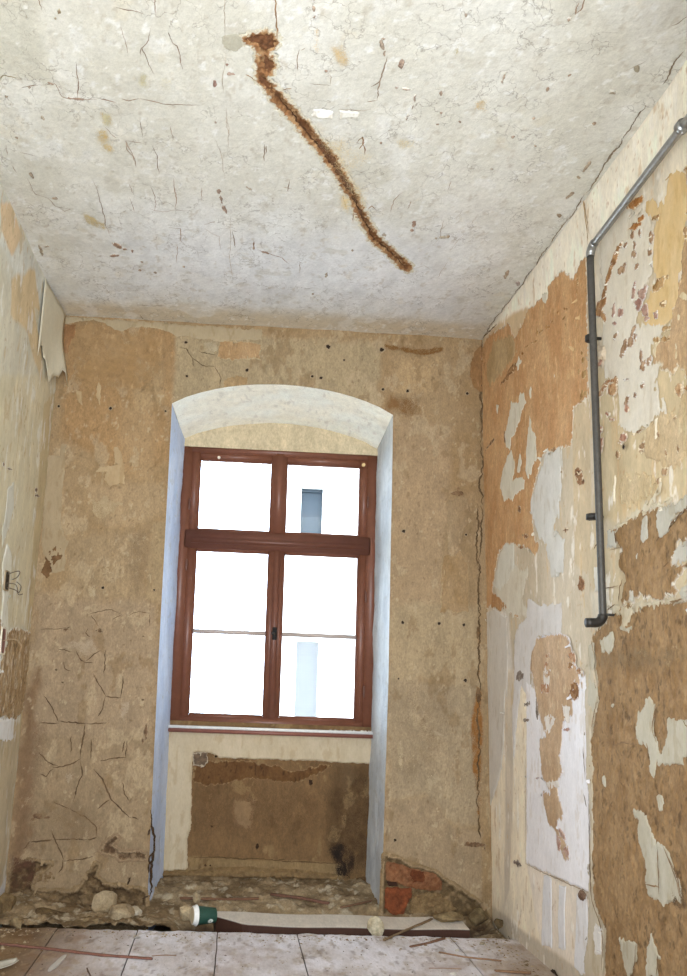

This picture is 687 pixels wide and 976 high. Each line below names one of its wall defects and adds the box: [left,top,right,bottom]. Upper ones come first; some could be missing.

crack [116,2,183,74]
crack [0,64,301,275]
crack [217,0,476,276]
spalling [500,270,581,386]
peeling [491,594,507,612]
flaking render [516,195,687,976]
flaking render [0,619,31,742]
crack [24,609,156,899]
peeling [192,752,332,787]
corrosion [469,686,483,816]
spalling [163,864,366,882]
spalling [379,852,493,925]